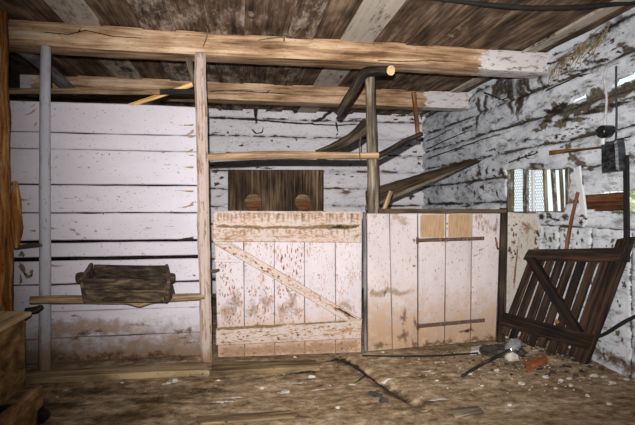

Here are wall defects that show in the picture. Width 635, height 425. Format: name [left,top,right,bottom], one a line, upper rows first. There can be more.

crack [44,28,137,38]
peeling [517,80,635,171]
peeling [469,159,506,200]